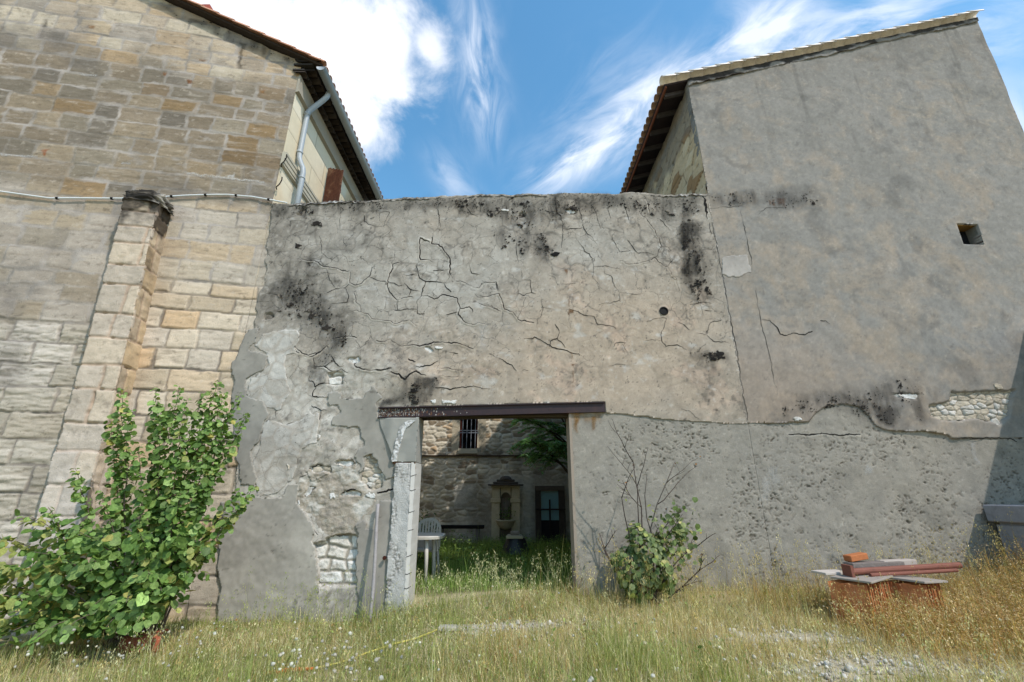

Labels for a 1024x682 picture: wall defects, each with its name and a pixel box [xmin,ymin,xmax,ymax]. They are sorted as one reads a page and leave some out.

water stain [277,193,712,303]
water stain [277,263,347,372]
crack [275,196,783,420]
crack [756,294,828,392]
flaking render [246,294,384,587]
crack [789,431,861,439]
water stain [782,379,924,424]
flaking render [929,384,1012,425]